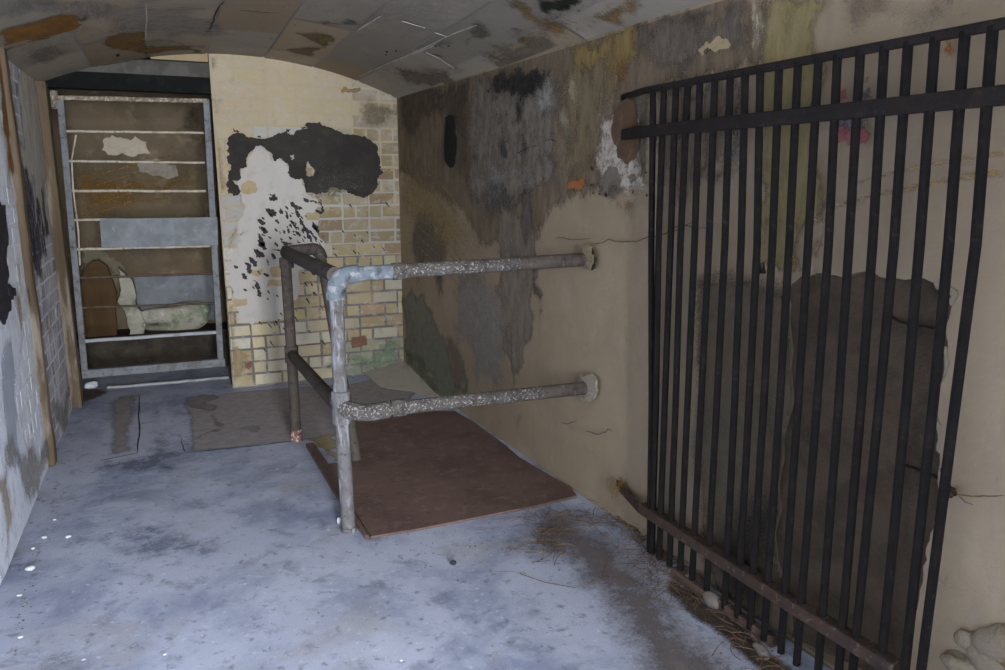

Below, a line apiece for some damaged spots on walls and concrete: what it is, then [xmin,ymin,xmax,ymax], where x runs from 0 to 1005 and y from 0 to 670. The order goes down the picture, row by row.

peeling [633,1,749,74]
damp [341,0,771,263]
peeling [590,98,648,199]
peeling [226,122,384,325]
spalling [351,334,367,348]
damp [436,269,542,384]
crack [104,397,140,460]
flaking render [776,272,959,670]